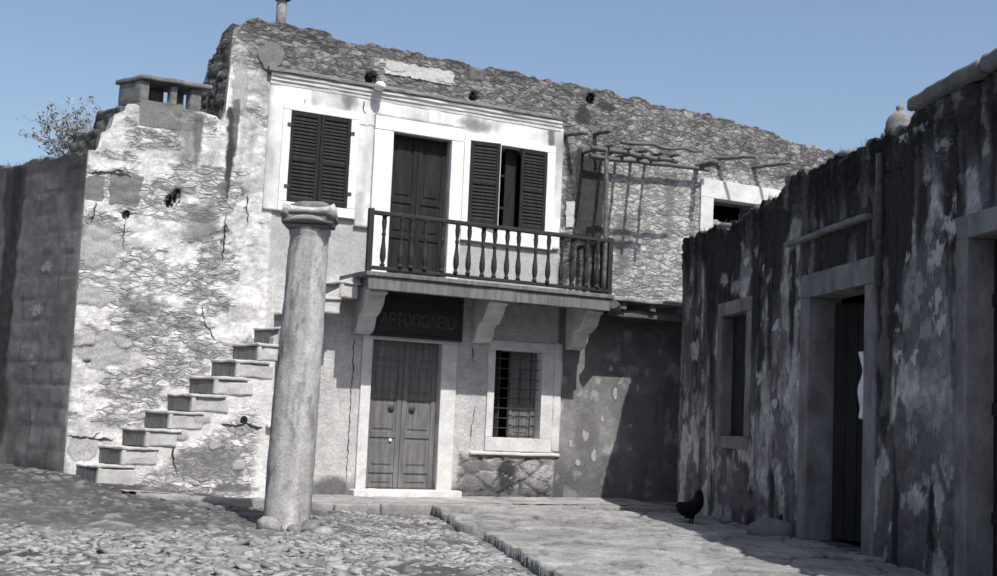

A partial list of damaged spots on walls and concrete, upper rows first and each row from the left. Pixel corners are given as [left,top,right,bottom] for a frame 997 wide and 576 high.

leakage [0,167,63,434]
crack [220,194,249,261]
crack [345,333,355,484]
peeling [678,269,709,441]
peeling [720,247,772,295]
leakage [702,211,796,374]
peeling [756,264,792,391]
leakage [813,215,865,273]
leakage [882,140,915,380]
peeling [894,192,957,386]
peeling [935,137,953,168]
leakage [933,109,958,250]